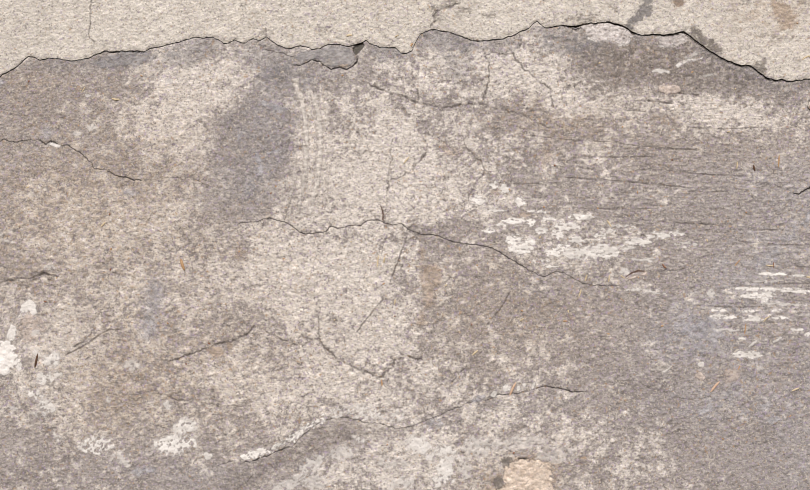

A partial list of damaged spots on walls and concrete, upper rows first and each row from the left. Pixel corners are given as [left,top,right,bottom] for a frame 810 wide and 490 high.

flaking render [295,45,355,67]
crack [0,21,810,82]
spalling [581,22,633,46]
spalling [656,34,687,47]
crack [1,139,142,181]
crack [240,207,554,277]
peeling [0,299,37,375]
flaking render [472,382,535,402]
flaking render [240,404,406,460]
spalling [493,457,555,490]